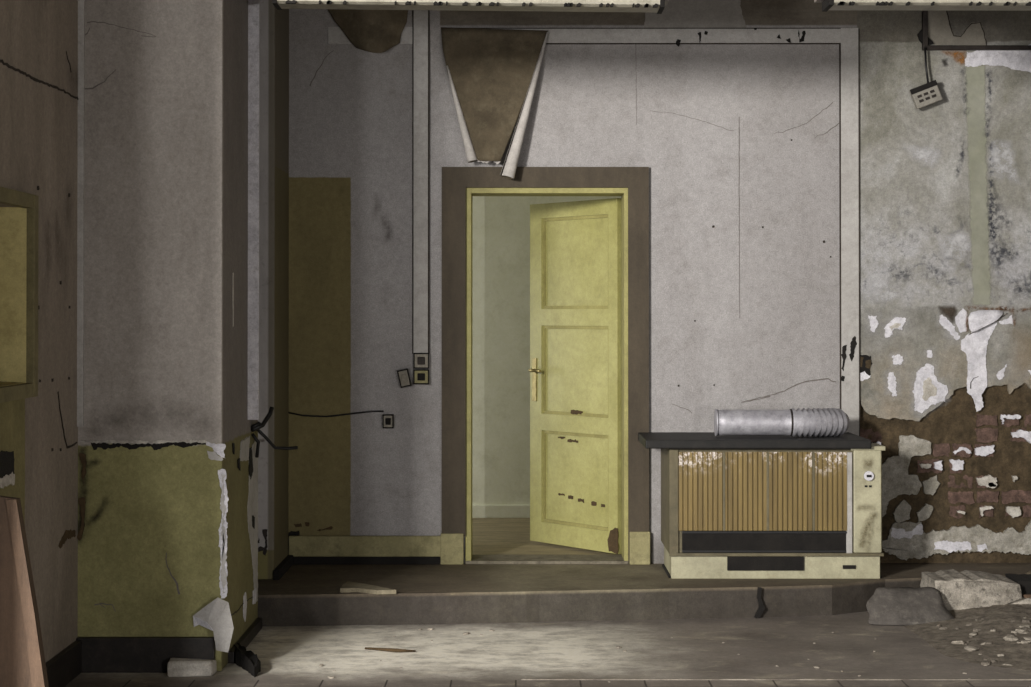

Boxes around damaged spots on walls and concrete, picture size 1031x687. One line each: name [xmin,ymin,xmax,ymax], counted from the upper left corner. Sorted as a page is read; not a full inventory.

crack [0,21,154,100]
flaking render [232,436,268,622]
crack [754,587,765,618]
flaking render [860,309,1031,563]